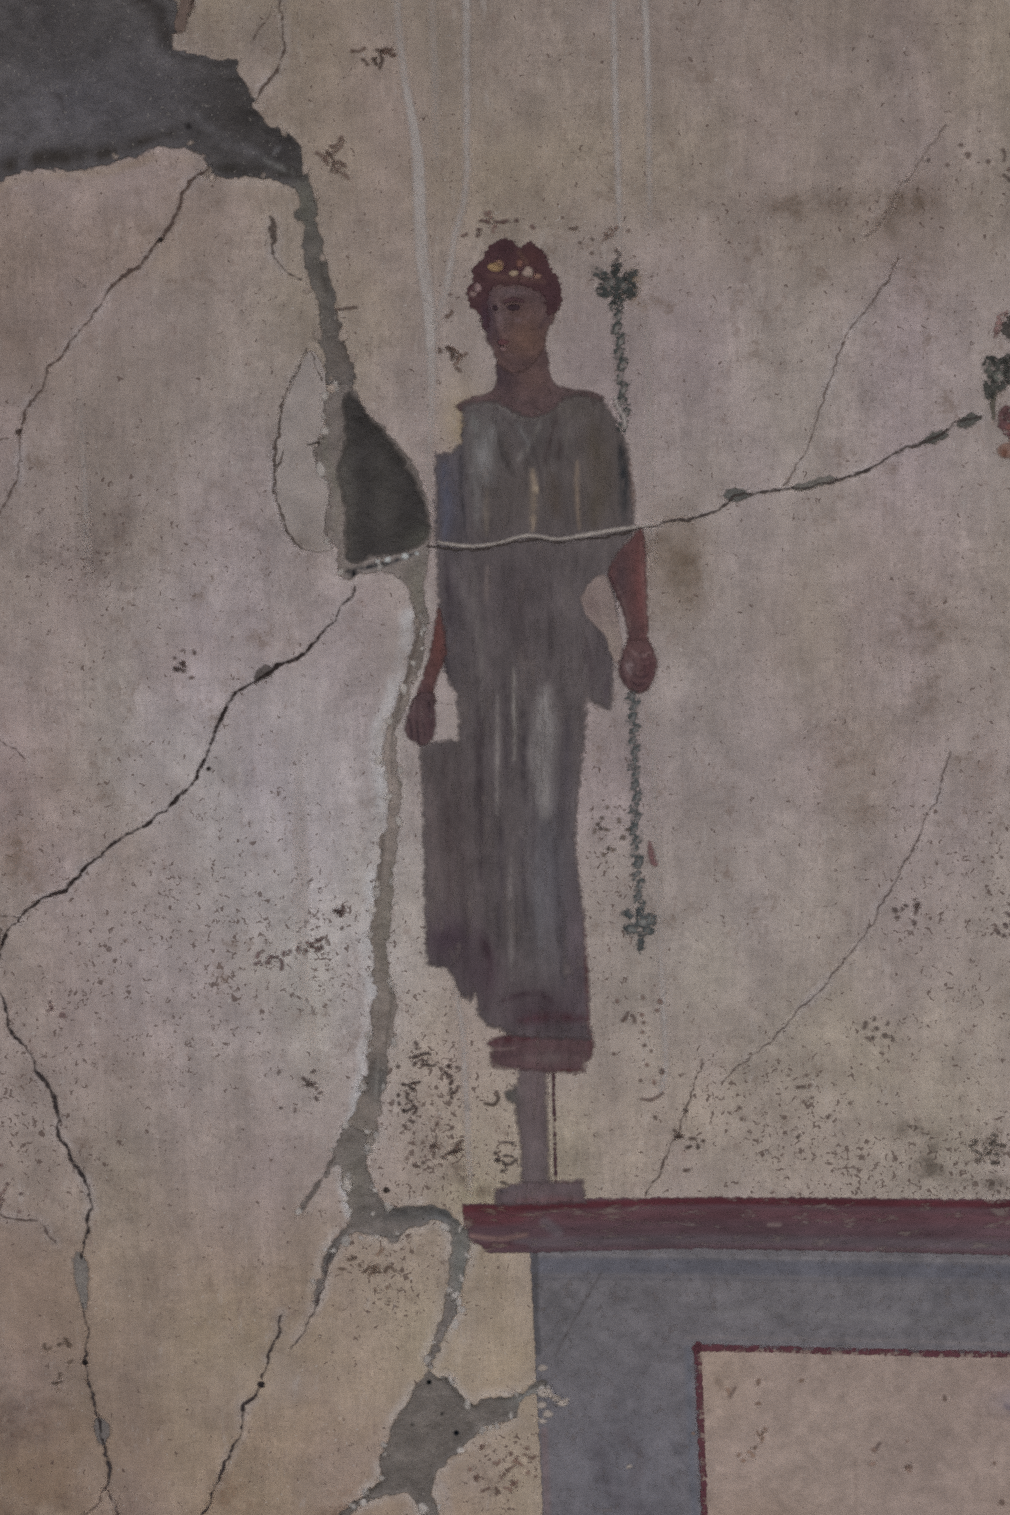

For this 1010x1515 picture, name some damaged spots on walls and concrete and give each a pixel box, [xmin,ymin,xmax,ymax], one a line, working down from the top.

crack [174,0,194,33]
crack [254,0,286,97]
crack [0,167,210,512]
crack [268,216,302,280]
crack [272,349,322,549]
crack [427,125,982,551]
crack [0,586,356,955]
flaking render [0,0,569,1515]
crack [0,995,93,1258]
crack [83,1310,119,1515]
crack [201,1254,332,1515]